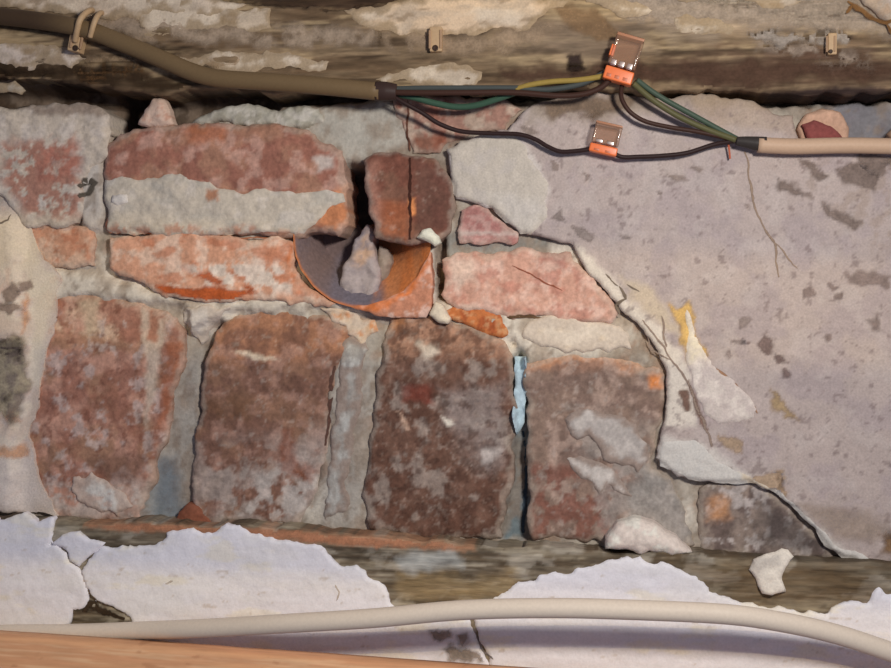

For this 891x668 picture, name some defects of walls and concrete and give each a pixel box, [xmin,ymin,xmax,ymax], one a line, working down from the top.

crack [405,99,413,240]
spalling [573,227,593,241]
crack [744,152,798,277]
crack [606,274,639,316]
crack [642,317,713,447]
flaking render [749,548,794,595]
crack [82,590,126,620]